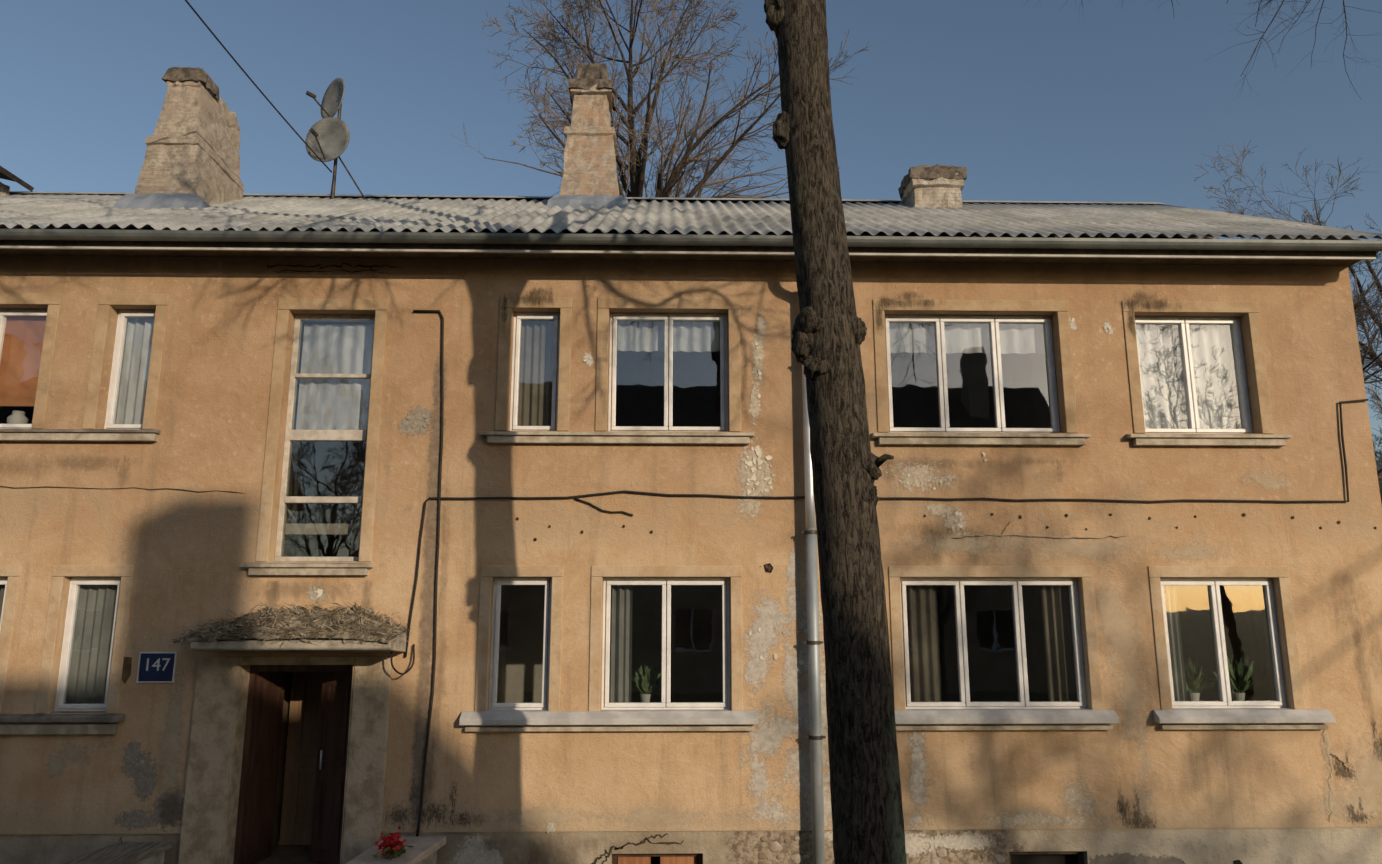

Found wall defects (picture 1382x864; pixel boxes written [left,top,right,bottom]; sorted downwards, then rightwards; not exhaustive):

peeling [734,314,776,525]
crack [0,486,246,494]
peeling [882,460,974,535]
peeling [739,548,832,830]
flaking render [113,739,184,832]
leakage [1118,789,1156,828]
crack [591,833,684,864]